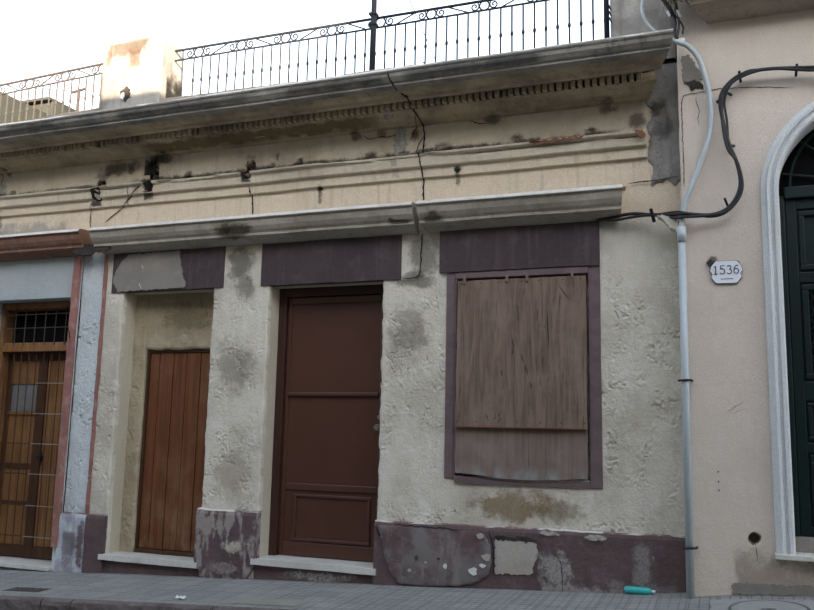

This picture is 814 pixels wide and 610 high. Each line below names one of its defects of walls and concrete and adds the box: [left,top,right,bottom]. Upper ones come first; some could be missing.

leakage [147,118,371,153]
leakage [141,127,566,183]
crack [363,73,425,200]
hole [90,180,106,207]
crack [90,184,139,228]
hole [140,164,160,200]
flaking render [113,250,186,293]
crack [403,233,423,279]
peeling [61,521,84,567]
peeling [221,541,241,554]
peeling [468,530,630,594]
peeling [633,544,674,593]